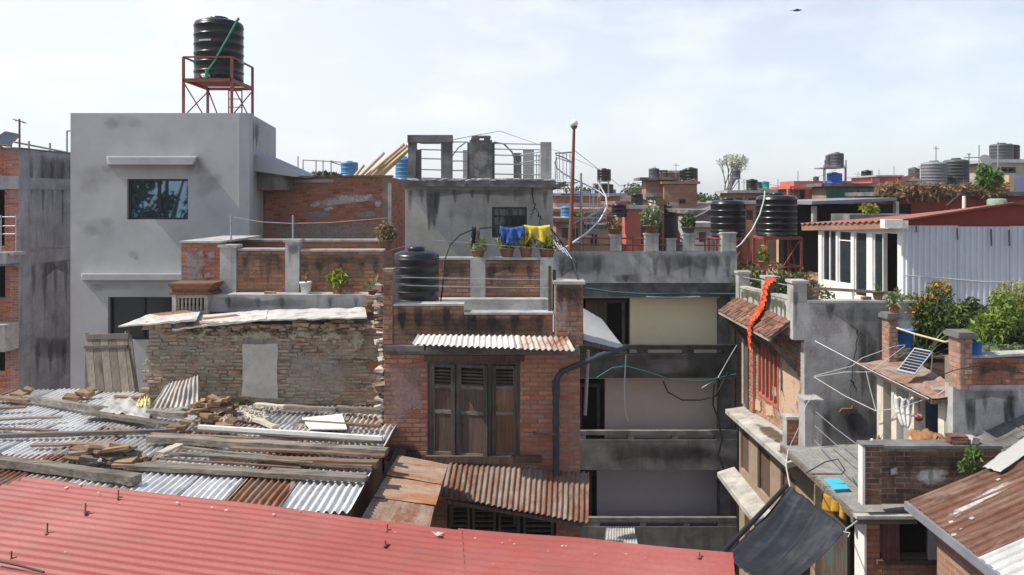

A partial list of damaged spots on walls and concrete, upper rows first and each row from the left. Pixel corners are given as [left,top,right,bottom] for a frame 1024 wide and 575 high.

flaking render [311,194,381,211]
leakage [398,310,542,336]
crack [845,330,859,395]